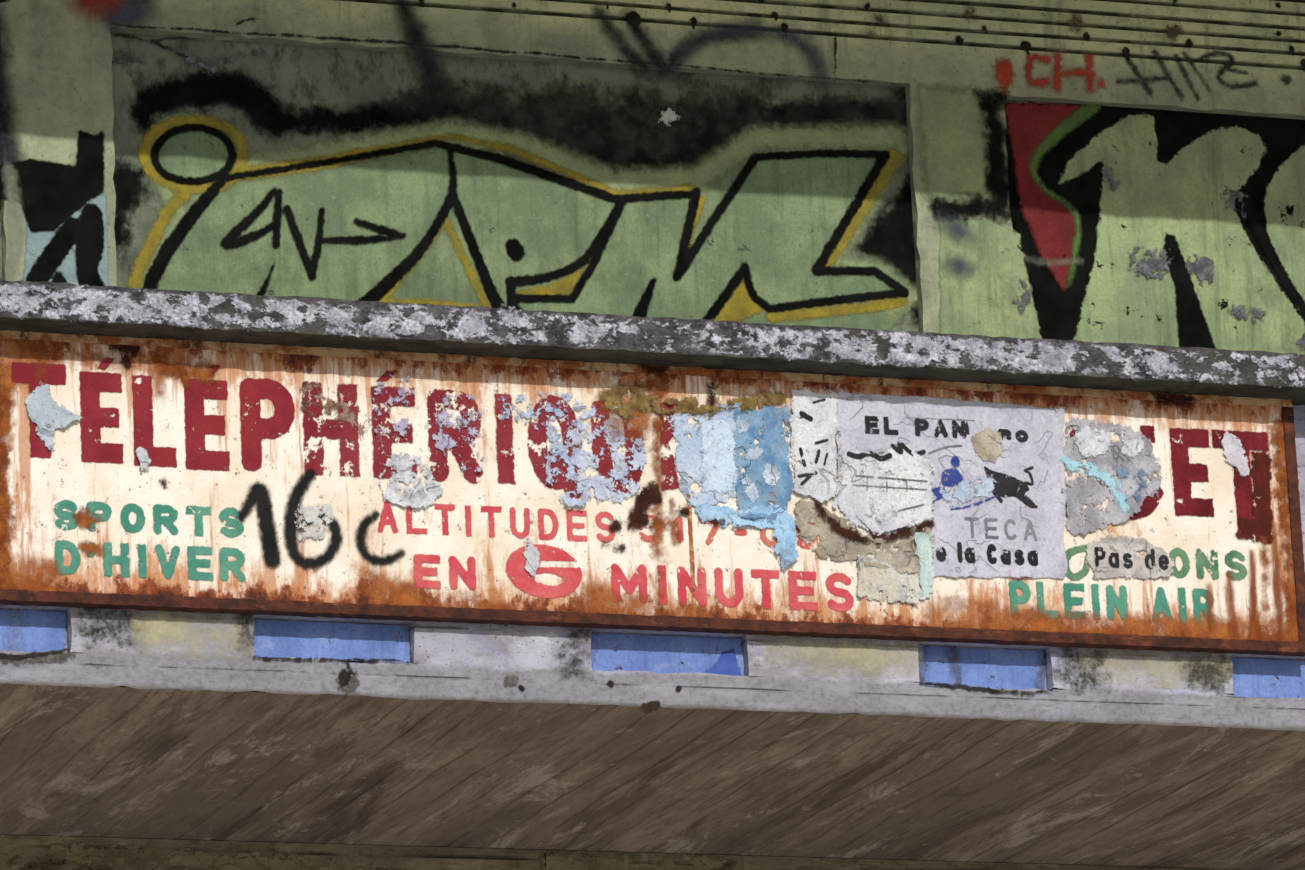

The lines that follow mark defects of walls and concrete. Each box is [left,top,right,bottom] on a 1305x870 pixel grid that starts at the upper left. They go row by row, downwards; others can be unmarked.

peeling [1128,246,1215,284]
peeling [0,279,1305,385]
corrosion [300,381,372,439]
corrosion [1151,393,1195,407]
corrosion [0,340,216,591]
corrosion [599,365,786,553]
corrosion [815,500,935,545]
corrosion [928,419,1299,641]
corrosion [367,572,514,610]
corrosion [577,586,710,618]